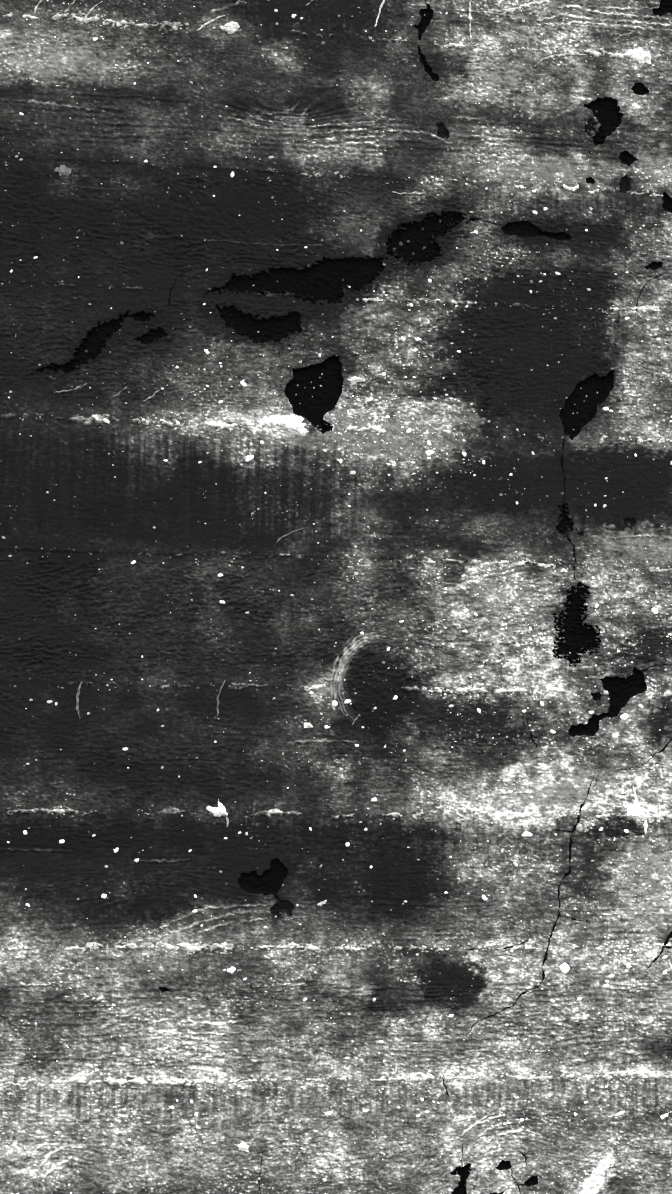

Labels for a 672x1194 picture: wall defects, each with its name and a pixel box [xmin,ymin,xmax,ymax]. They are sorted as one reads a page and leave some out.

spalling [583,97,624,145]
water stain [492,157,610,191]
water stain [0,160,468,355]
spalling [285,355,344,434]
water stain [239,199,672,568]
spalling [559,369,614,440]
spalling [552,583,601,667]
spalling [568,667,647,737]
water stain [120,875,195,930]
water stain [0,799,461,914]
crack [466,738,672,1036]
spalling [450,1163,478,1194]